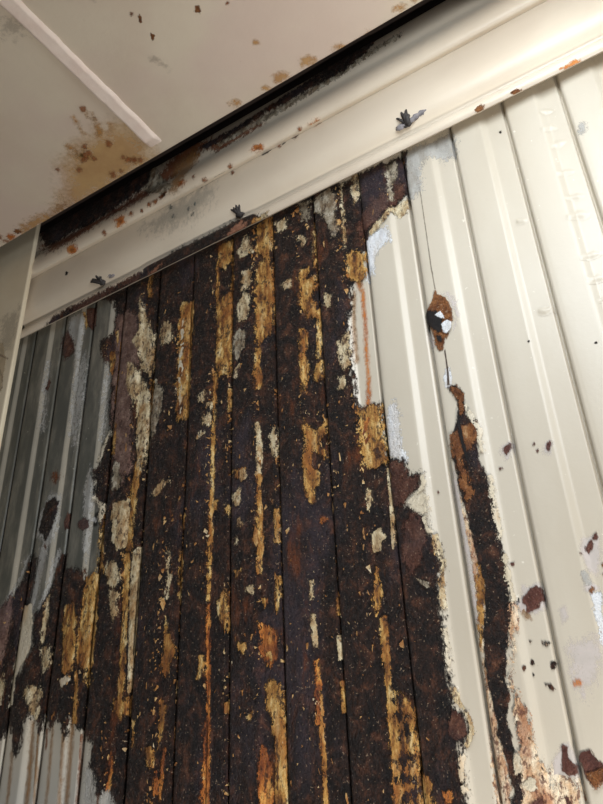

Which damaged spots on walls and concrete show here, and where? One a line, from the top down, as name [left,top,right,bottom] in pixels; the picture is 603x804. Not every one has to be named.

rust [0,34,402,254]
rust [0,150,474,804]
peeling [386,398,409,464]
peeling [406,488,432,516]
rust [447,384,603,804]